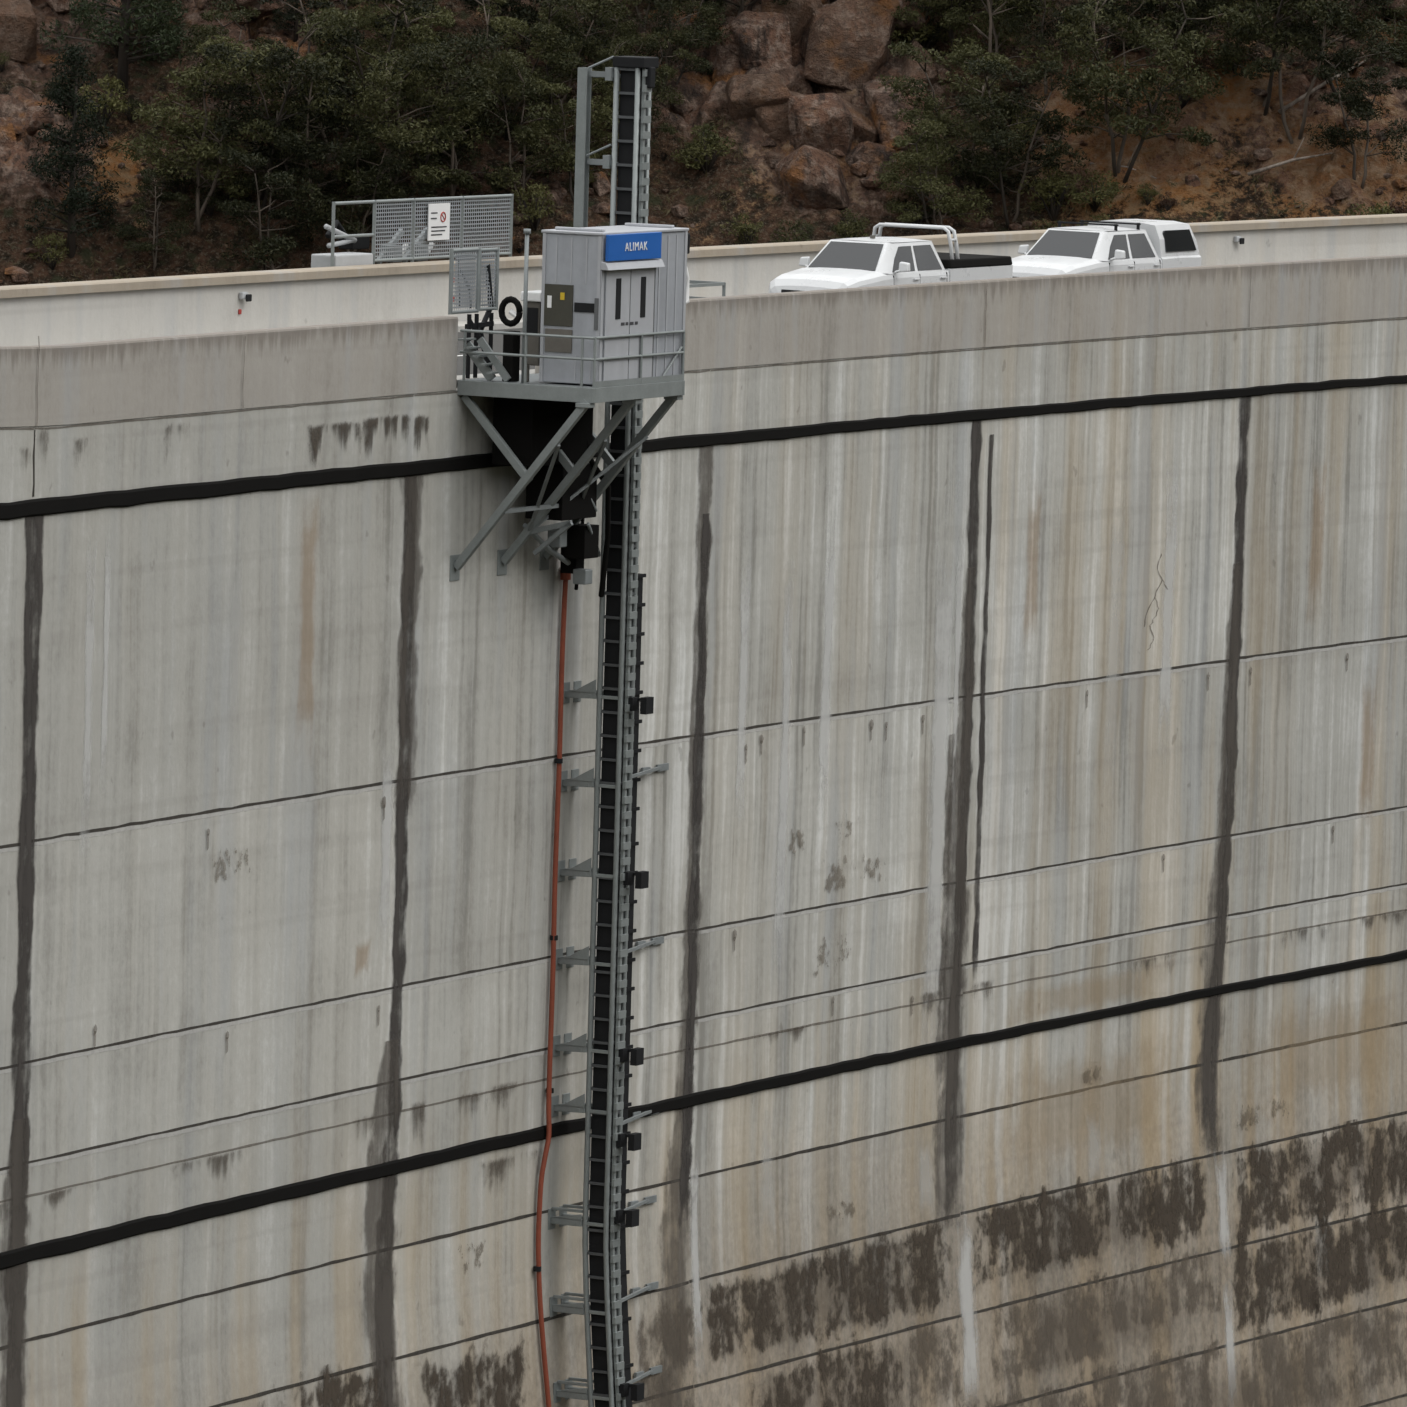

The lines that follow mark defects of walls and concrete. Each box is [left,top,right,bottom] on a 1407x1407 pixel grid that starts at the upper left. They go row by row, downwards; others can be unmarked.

damp [310,415,429,461]
crack [638,554,1407,749]
crack [0,748,602,853]
damp [924,420,994,1209]
damp [1196,396,1251,1144]
damp [0,515,44,1407]
damp [365,475,424,1407]
damp [1220,1178,1228,1246]
efflorescence [960,1240,976,1384]
damp [1226,1316,1235,1396]